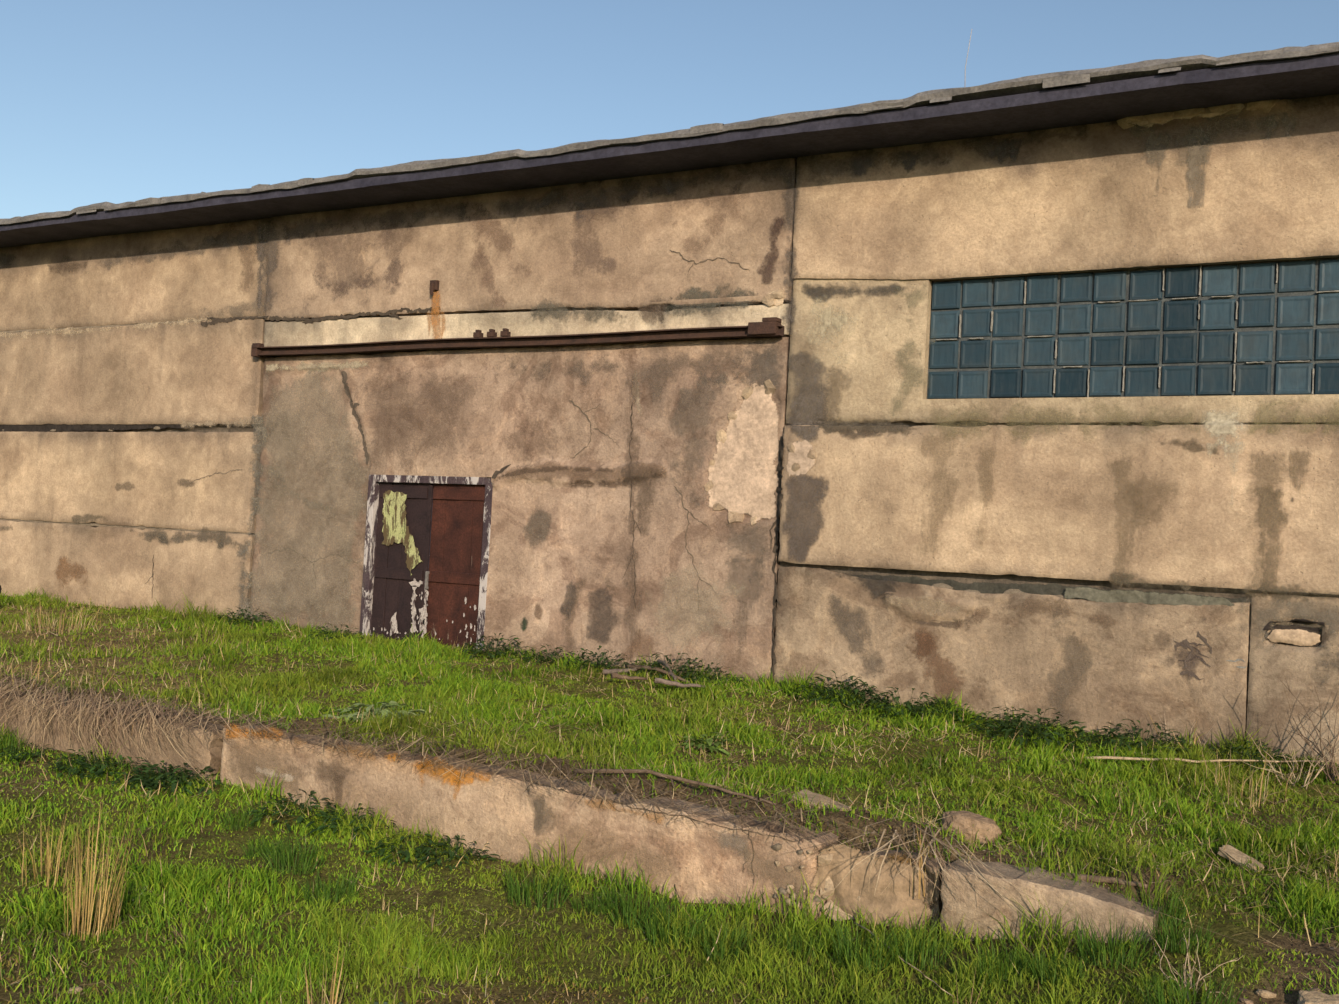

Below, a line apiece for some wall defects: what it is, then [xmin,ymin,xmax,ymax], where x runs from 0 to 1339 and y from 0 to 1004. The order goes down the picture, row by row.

water stain [1186,126,1218,207]
crack [670,250,750,279]
corrosion [429,280,443,339]
crack [341,371,369,465]
spalling [704,379,816,526]
spalling [819,419,909,439]
crack [674,486,717,615]
water stain [783,475,828,562]
water stain [1255,453,1339,637]